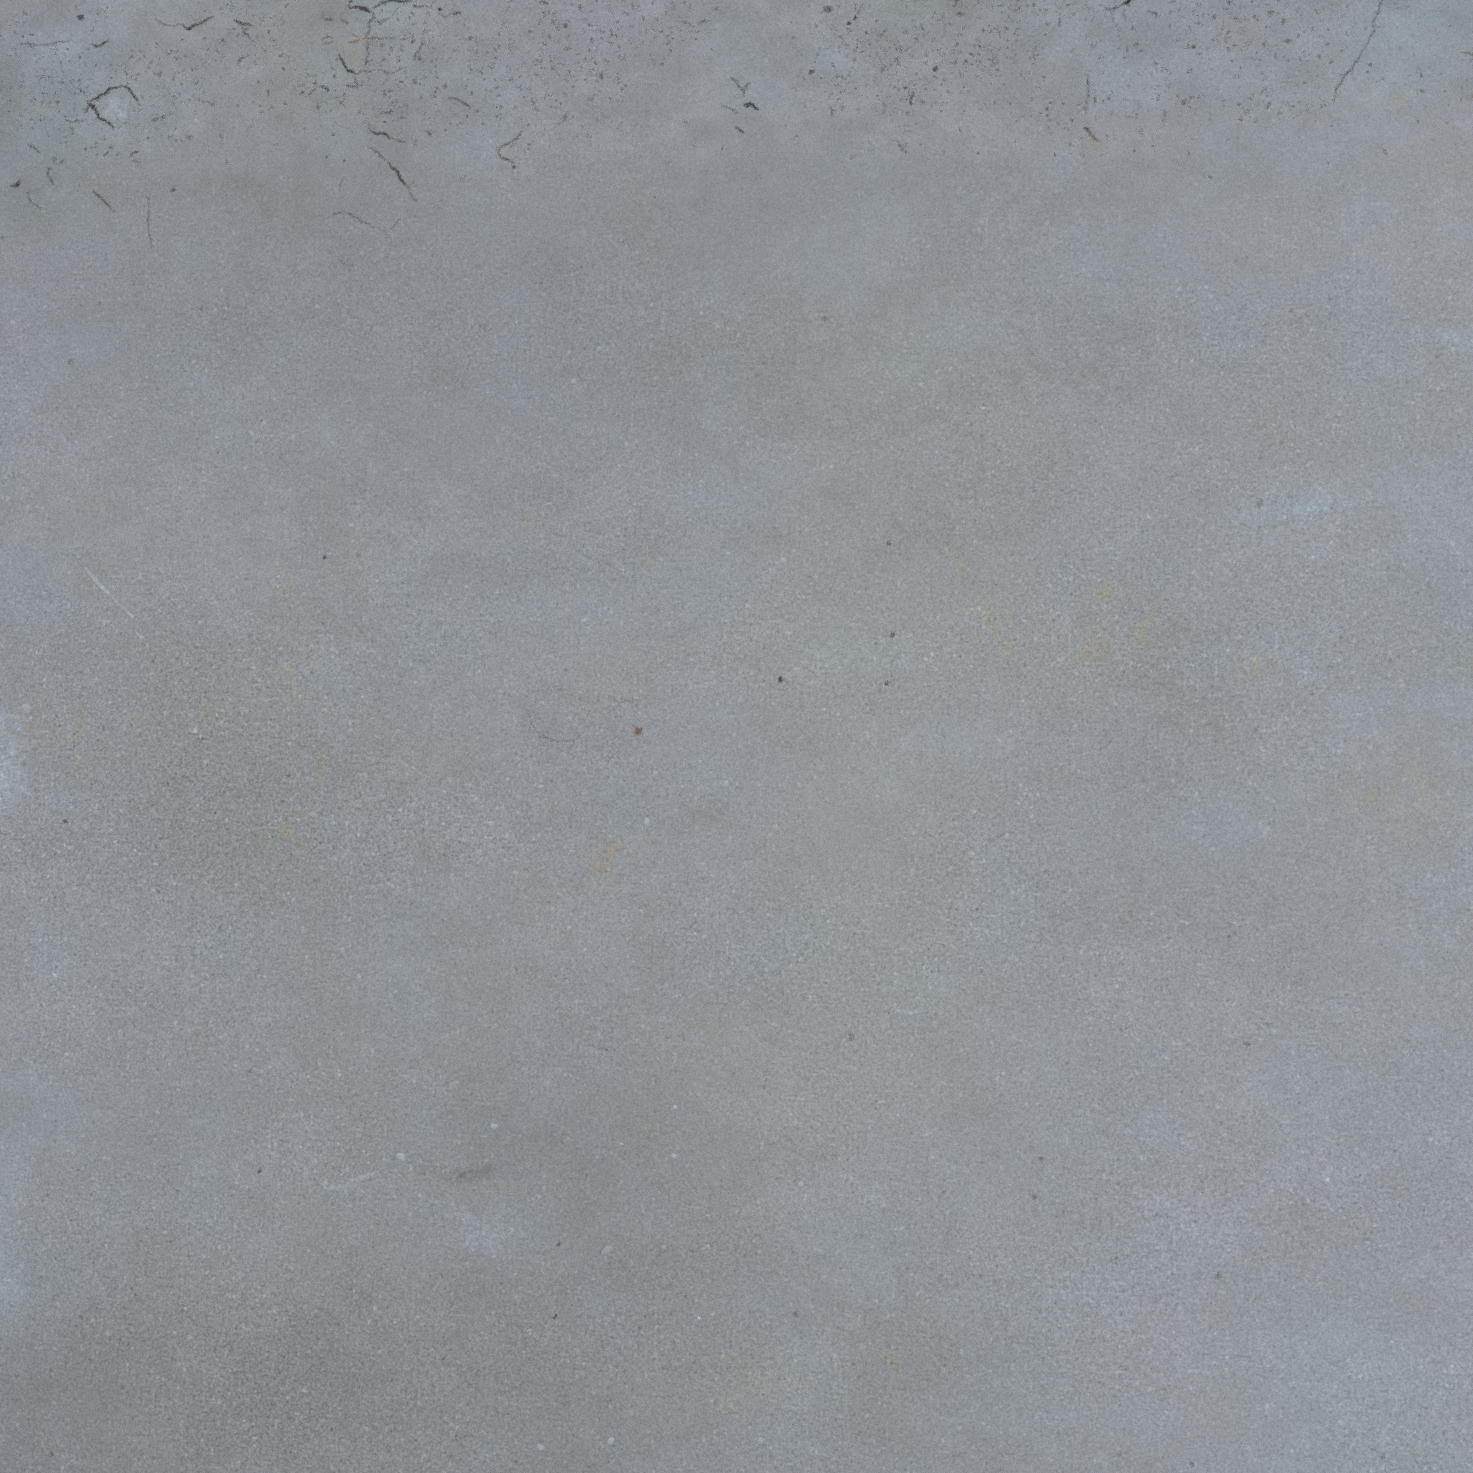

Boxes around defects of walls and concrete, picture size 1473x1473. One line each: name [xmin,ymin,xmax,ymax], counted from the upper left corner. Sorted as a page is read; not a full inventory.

crack [156,15,253,39]
crack [302,0,459,94]
crack [1333,2,1381,102]
crack [324,111,429,243]
crack [490,129,523,180]